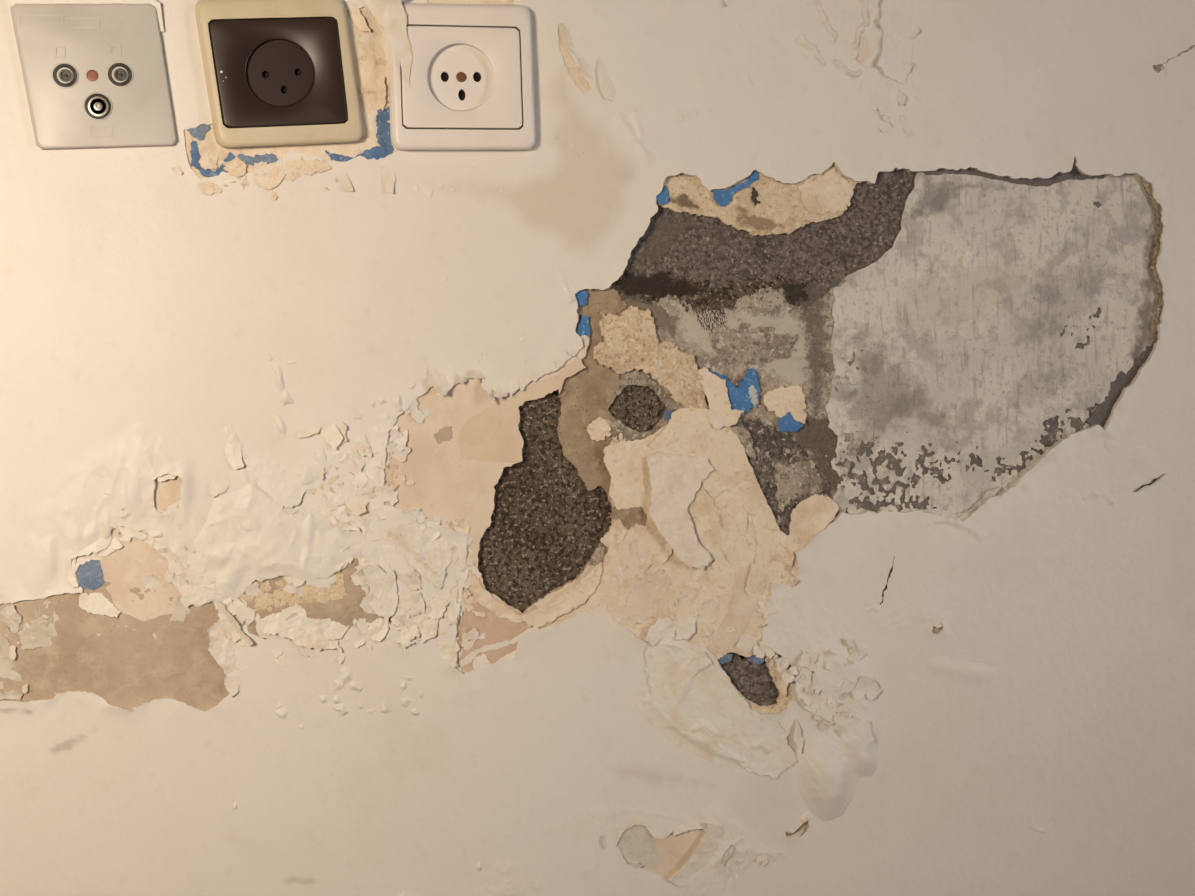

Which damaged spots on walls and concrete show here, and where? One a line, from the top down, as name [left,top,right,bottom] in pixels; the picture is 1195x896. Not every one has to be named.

peeling [172,0,413,200]
crack [1153,45,1195,76]
flaking render [0,167,1164,714]
peeling [585,802,813,896]